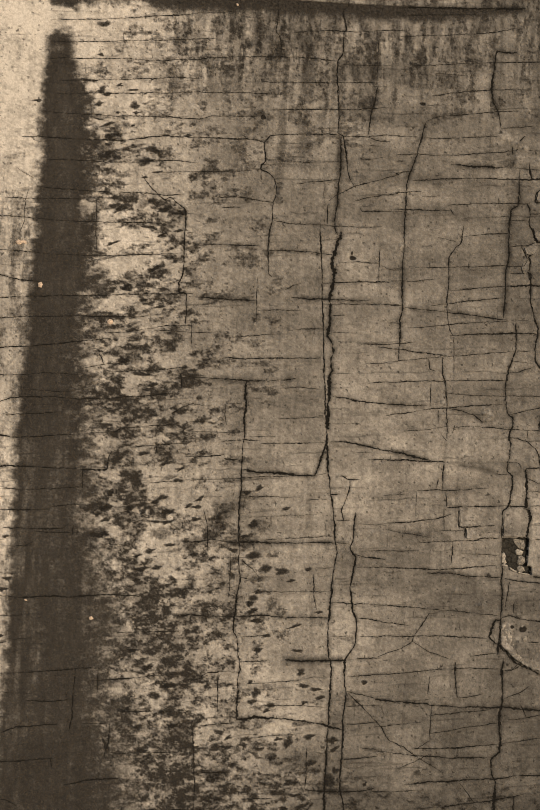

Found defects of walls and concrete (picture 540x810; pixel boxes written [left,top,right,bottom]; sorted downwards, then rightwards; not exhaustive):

leakage [50,0,97,11]
crack [51,0,288,61]
crack [96,75,196,83]
leakage [142,0,519,124]
crack [88,134,192,142]
crack [46,111,255,120]
crack [0,163,299,348]
crack [0,389,172,409]
crack [0,403,200,438]
leakage [0,29,343,810]
crack [0,451,112,546]
peeling [459,507,531,575]